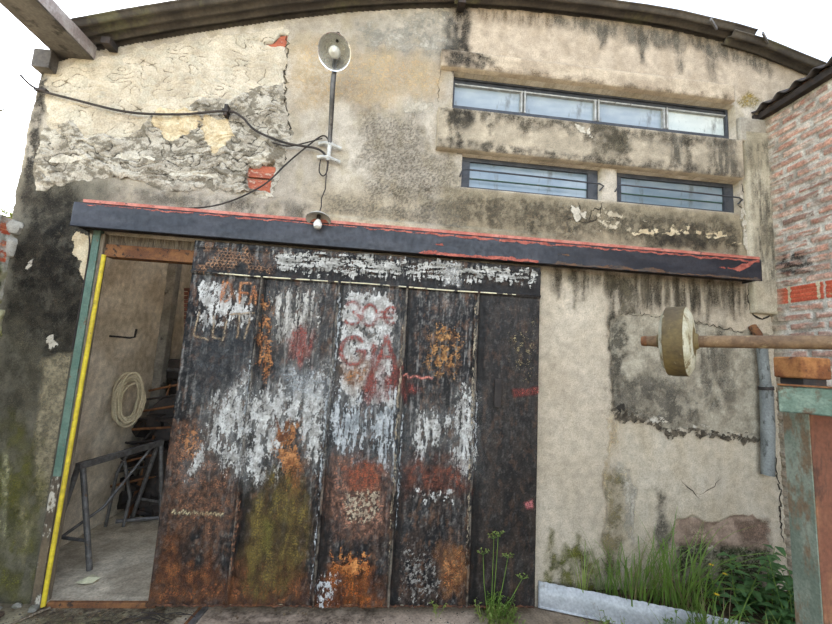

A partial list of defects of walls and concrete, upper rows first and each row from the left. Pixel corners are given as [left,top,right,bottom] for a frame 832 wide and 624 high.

water stain [359,7,502,71]
water stain [332,94,738,251]
water stain [0,73,87,435]
peeling [88,195,760,289]
peeling [195,279,254,332]
water stain [552,269,747,328]
corrosion [422,323,466,382]
flaking render [608,313,760,452]
peeling [184,287,479,609]
corrosion [328,453,389,537]
corrosion [326,551,382,608]
corrosion [398,542,465,608]